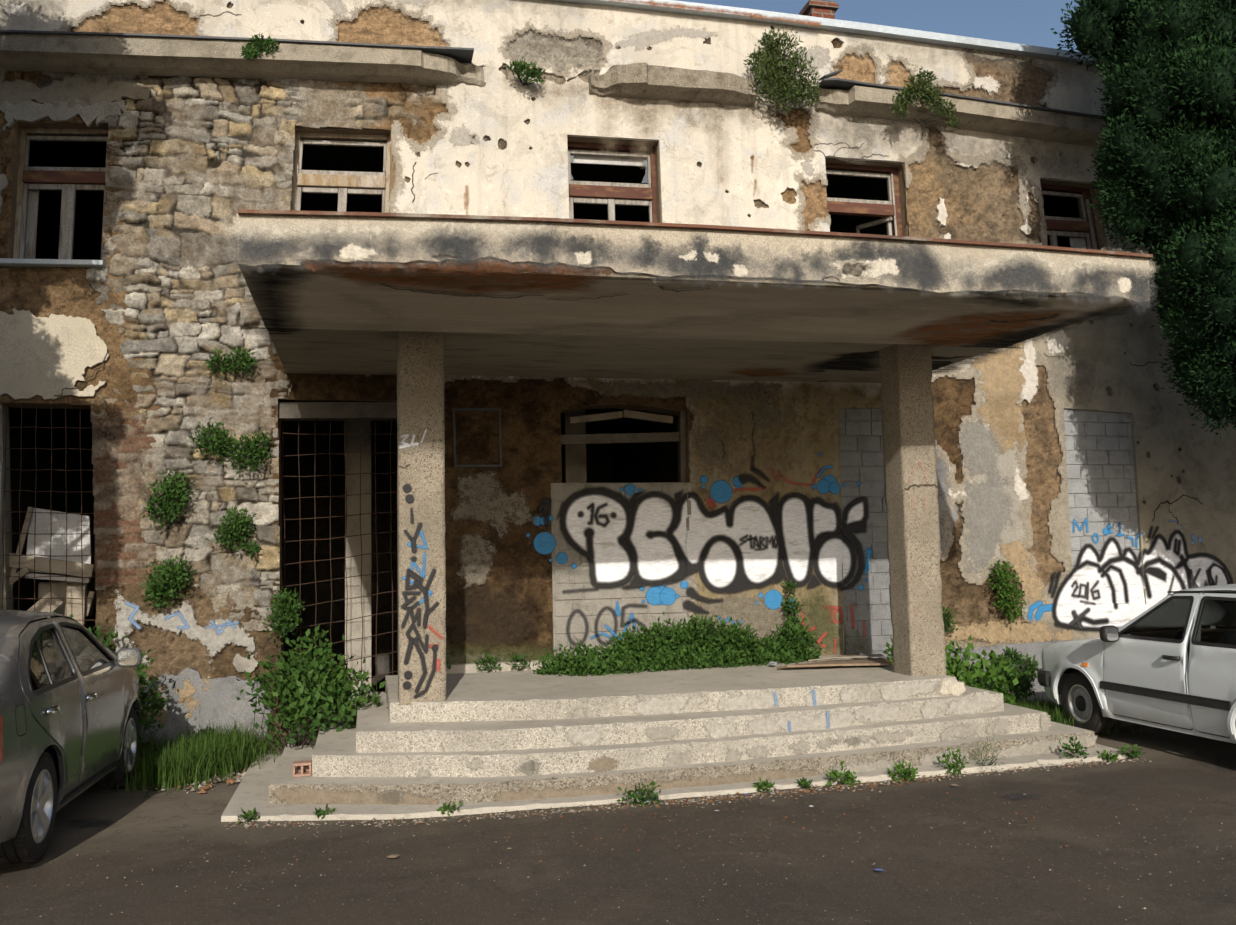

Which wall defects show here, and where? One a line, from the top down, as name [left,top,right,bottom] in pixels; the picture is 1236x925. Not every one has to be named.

spalling [67,0,200,36]
spalling [499,26,717,85]
spalling [776,108,829,231]
spalling [899,126,1043,245]
spalling [0,71,507,753]
rust [311,263,599,293]
damp [233,219,1153,374]
damp [811,350,879,382]
rust [904,312,1062,346]
spalling [444,378,694,664]
spalling [931,330,1074,644]
crack [1152,495,1203,523]